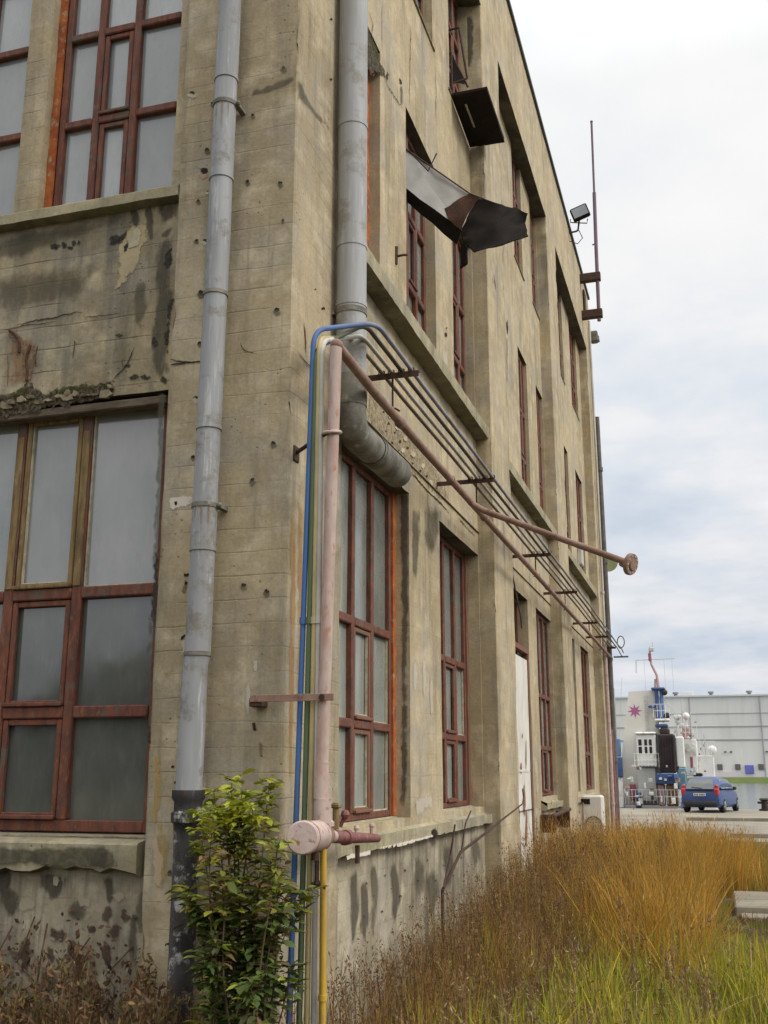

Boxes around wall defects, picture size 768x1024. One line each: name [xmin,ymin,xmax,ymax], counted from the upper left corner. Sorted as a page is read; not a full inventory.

damp [0,228,84,255]
damp [0,271,89,305]
crack [2,311,120,330]
peeling [115,224,147,289]
spalling [0,329,115,419]
damp [109,206,176,652]
peeling [367,395,448,498]
damp [0,847,114,902]
damp [351,842,480,940]